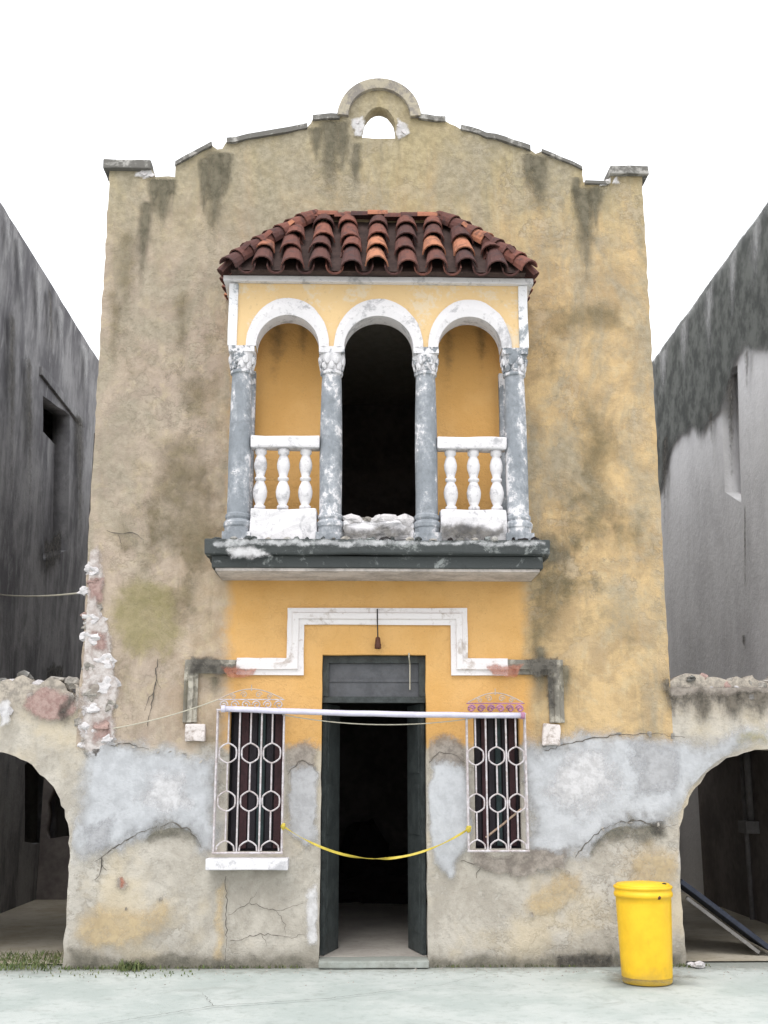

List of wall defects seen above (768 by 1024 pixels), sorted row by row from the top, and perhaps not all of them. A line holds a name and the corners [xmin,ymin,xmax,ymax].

leakage [312,122,360,176]
leakage [140,179,175,255]
leakage [200,152,231,219]
leakage [573,177,601,248]
peeling [0,548,218,861]
crack [144,659,161,726]
peeling [428,728,768,878]
crack [230,892,308,945]